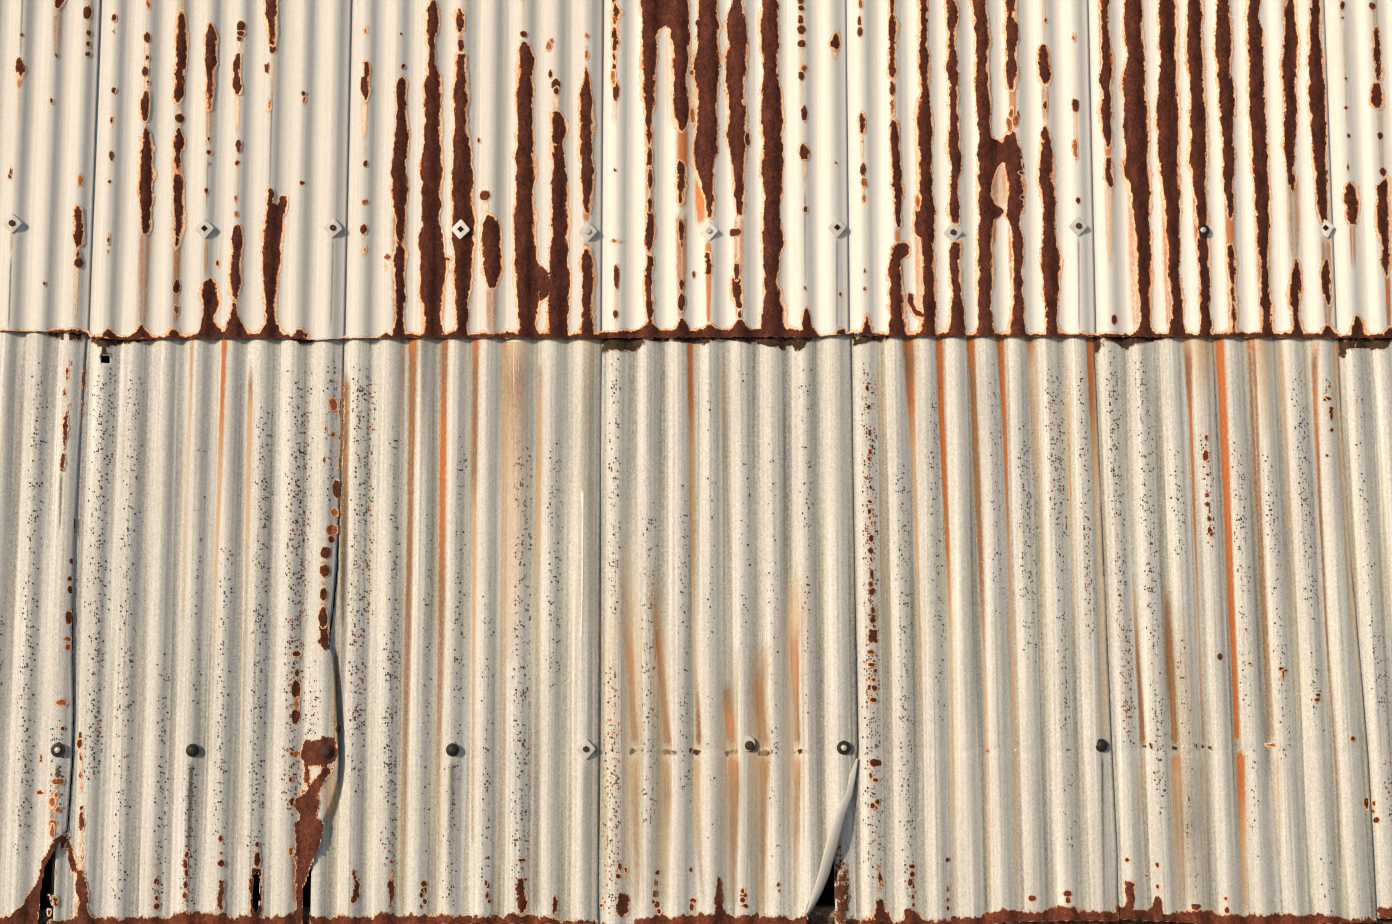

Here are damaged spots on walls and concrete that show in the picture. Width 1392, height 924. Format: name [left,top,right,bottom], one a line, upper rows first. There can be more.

rust [14,56,27,87]
rust [46,0,324,595]
rust [0,359,808,924]
rust [330,0,1392,893]